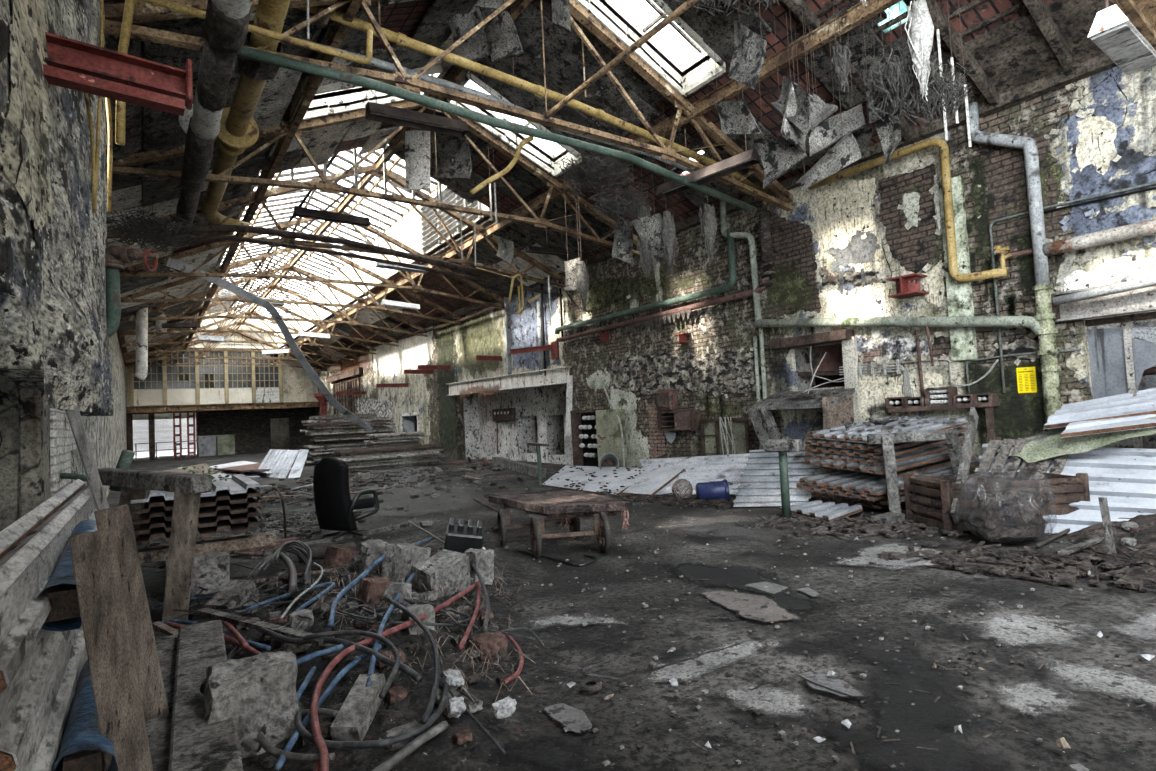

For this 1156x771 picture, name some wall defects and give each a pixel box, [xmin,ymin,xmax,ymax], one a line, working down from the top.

spalling [977,98,1156,255]
peeling [654,263,662,313]
spalling [765,161,969,420]
peeling [1063,236,1156,291]
spalling [586,347,762,468]